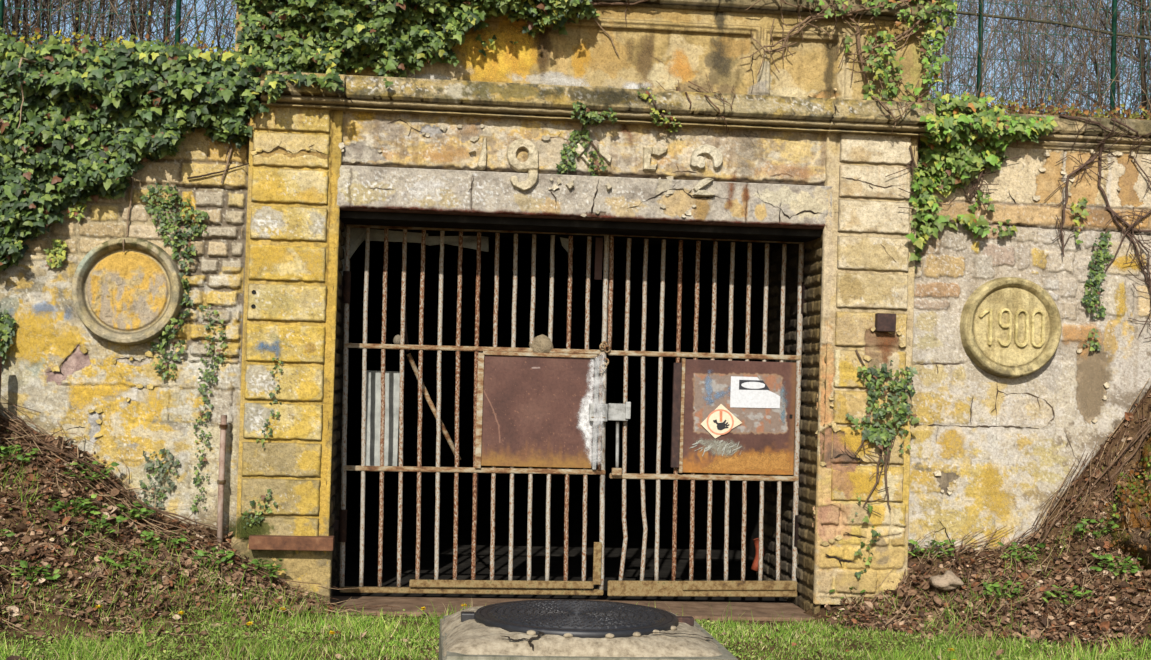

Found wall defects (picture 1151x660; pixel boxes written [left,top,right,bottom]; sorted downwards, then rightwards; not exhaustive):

leakage [512,27,652,105]
leakage [713,11,730,74]
leakage [826,44,834,97]
crack [262,144,327,155]
spalling [419,120,484,143]
peeling [1032,149,1144,207]
spalling [46,344,91,385]
leakage [1078,348,1112,415]